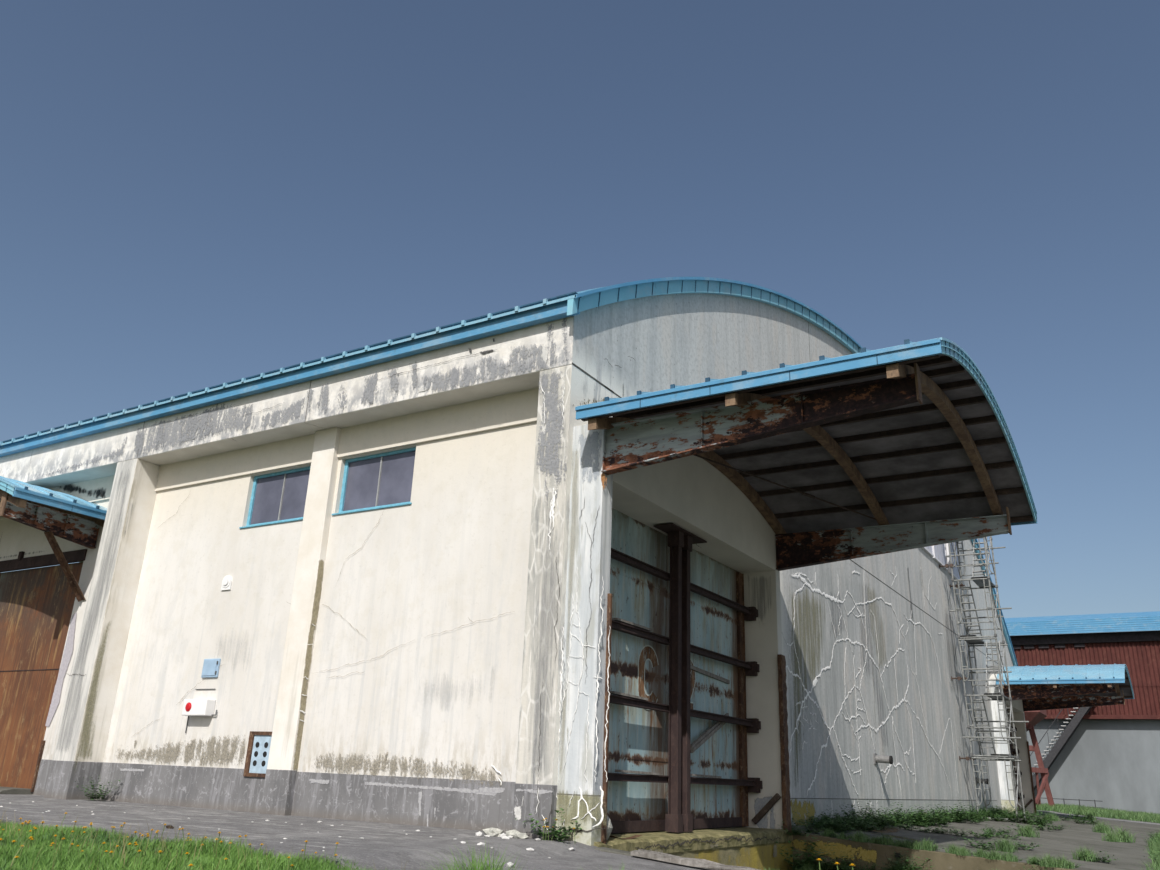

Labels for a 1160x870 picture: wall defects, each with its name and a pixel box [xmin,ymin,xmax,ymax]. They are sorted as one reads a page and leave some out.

damp [39,383,347,498]
damp [361,318,567,499]
crack [540,382,565,432]
crack [299,604,514,722]
crack [522,476,613,833]
crack [786,566,963,798]
damp [116,735,245,765]
damp [314,752,502,786]